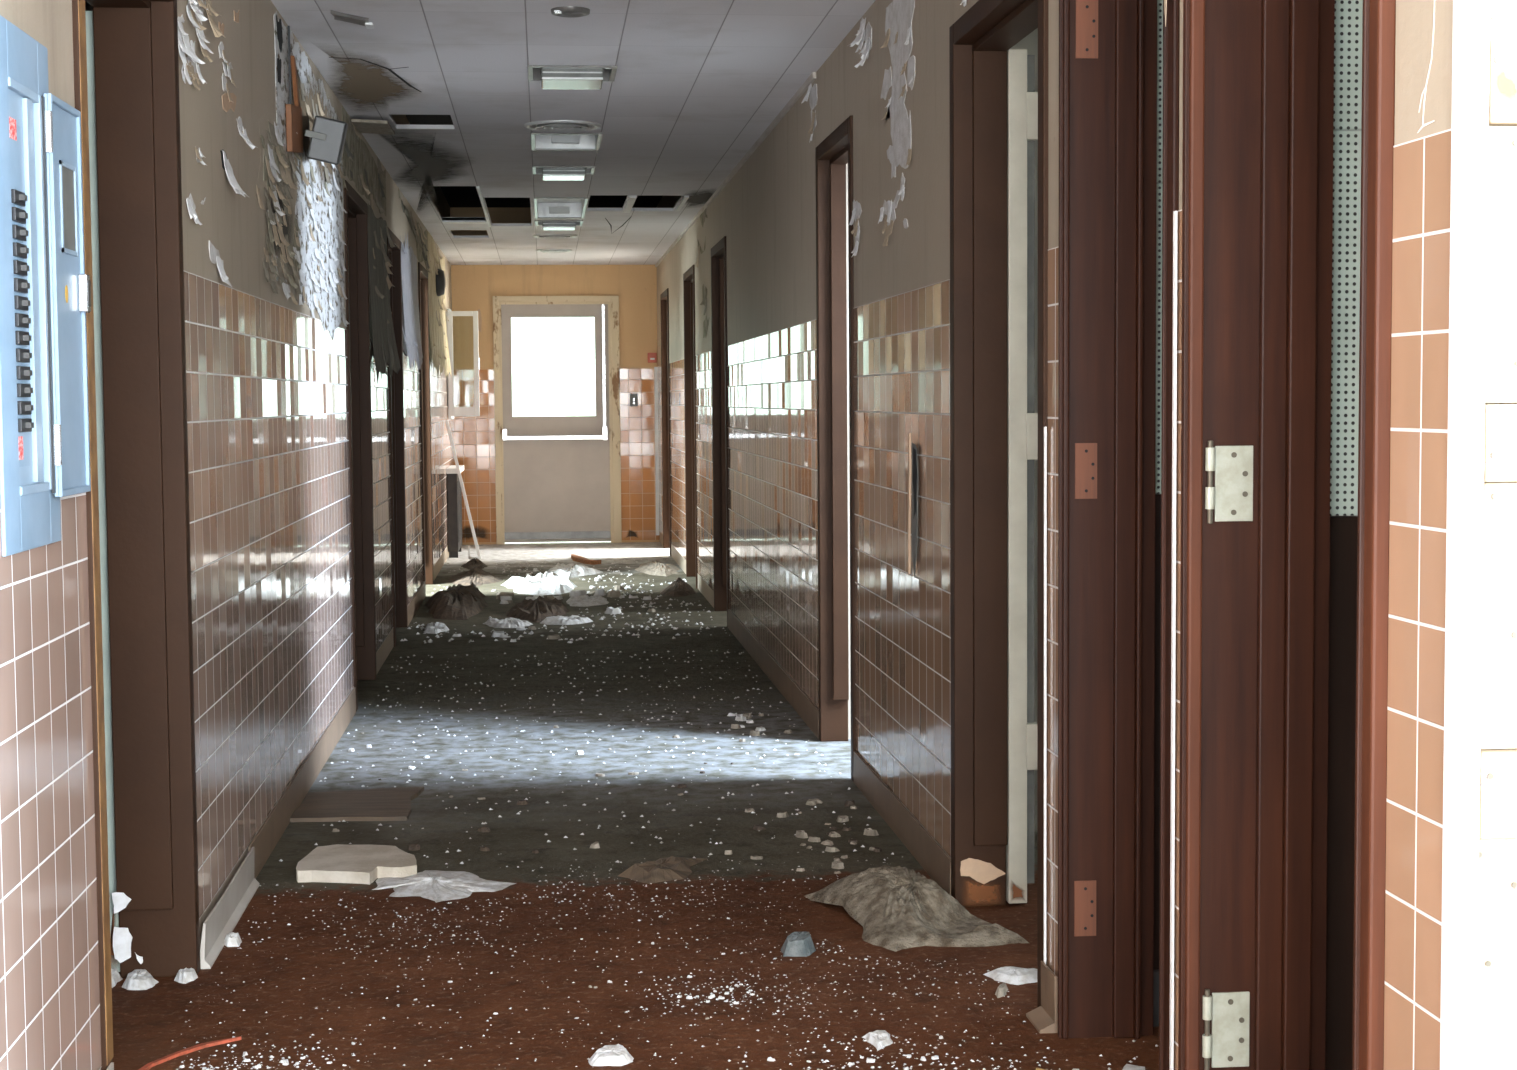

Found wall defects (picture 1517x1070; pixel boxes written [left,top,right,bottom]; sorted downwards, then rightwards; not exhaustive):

peeling [177,0,452,385]
peeling [849,200,862,256]
peeling [849,0,915,247]
peeling [112,892,143,964]